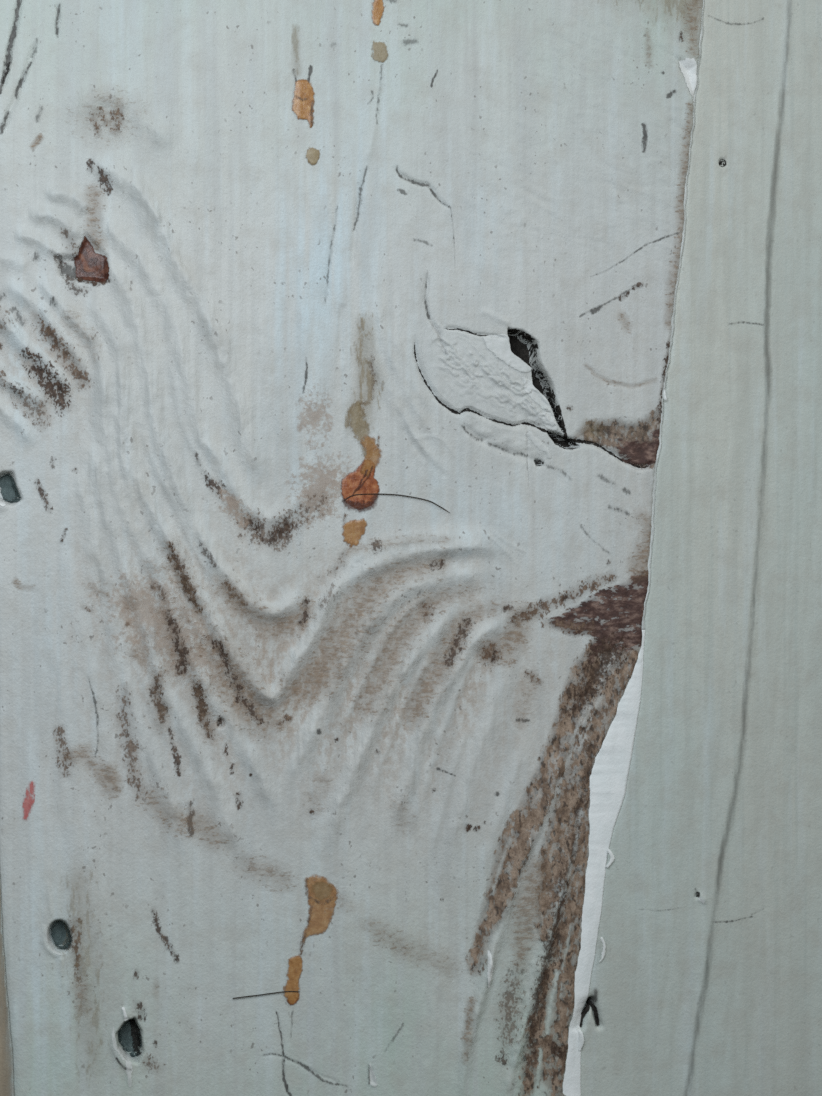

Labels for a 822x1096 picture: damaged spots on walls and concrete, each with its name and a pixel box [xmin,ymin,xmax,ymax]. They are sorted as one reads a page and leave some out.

water stain [0,309,91,426]
crack [414,284,652,468]
water stain [410,526,652,1096]
spalling [563,630,645,1096]
crack [272,1012,339,1096]